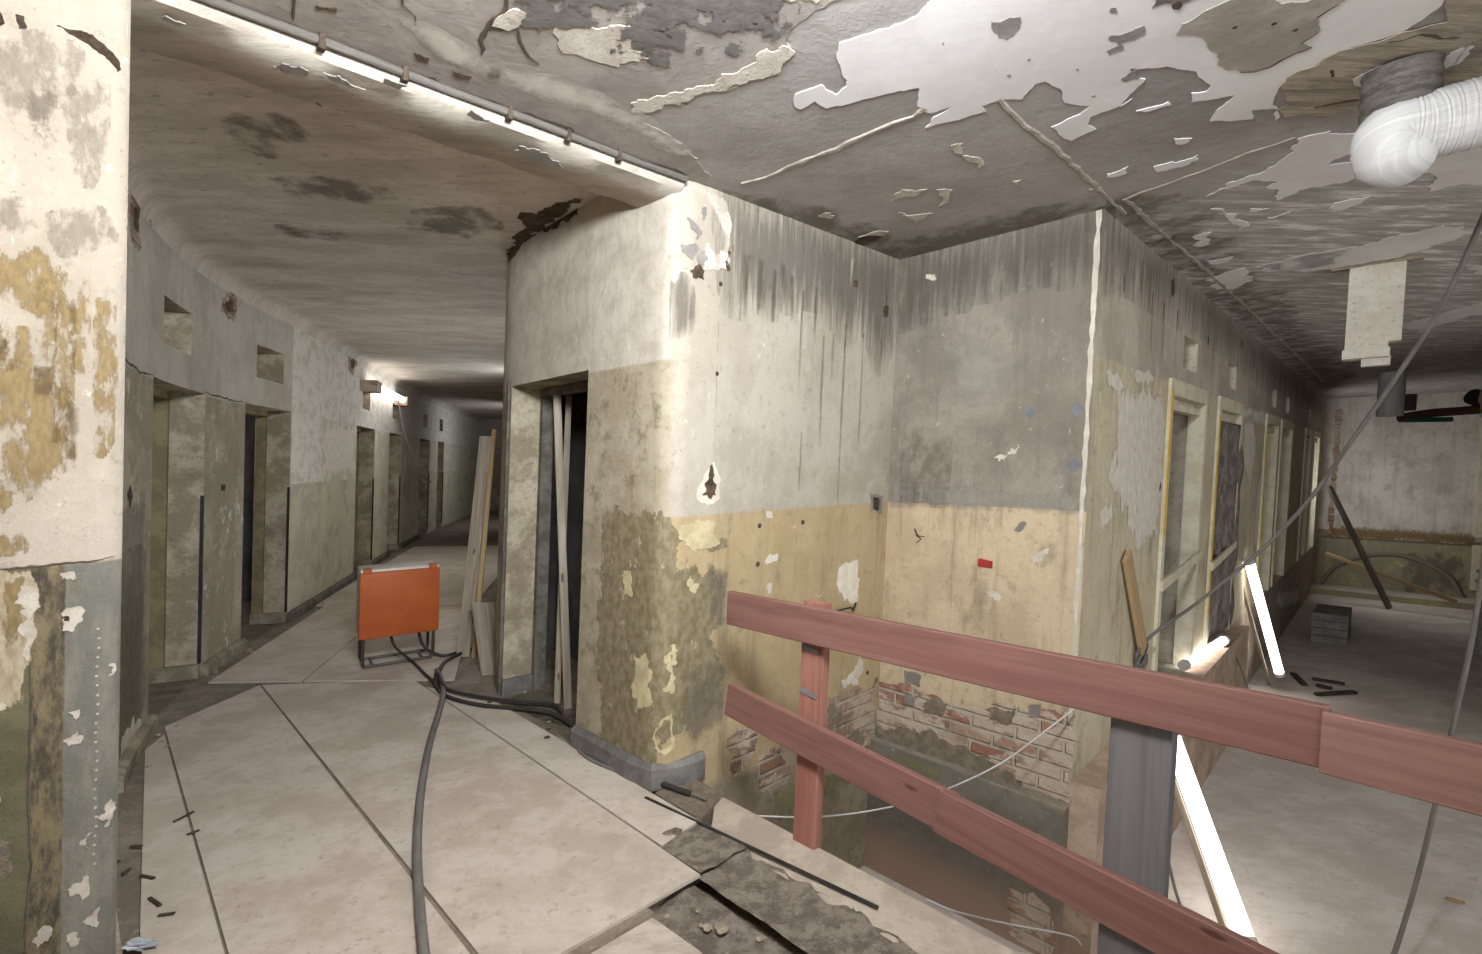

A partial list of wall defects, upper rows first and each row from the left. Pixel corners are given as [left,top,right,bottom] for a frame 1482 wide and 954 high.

damp [0,29,111,186]
flaking render [56,25,121,72]
crack [289,0,297,21]
crack [478,0,539,65]
peeling [226,0,836,283]
peeling [794,0,1482,230]
damp [0,197,19,229]
damp [49,207,114,258]
damp [677,274,692,327]
damp [737,206,894,354]
peeling [0,570,41,711]
peeling [596,461,728,763]